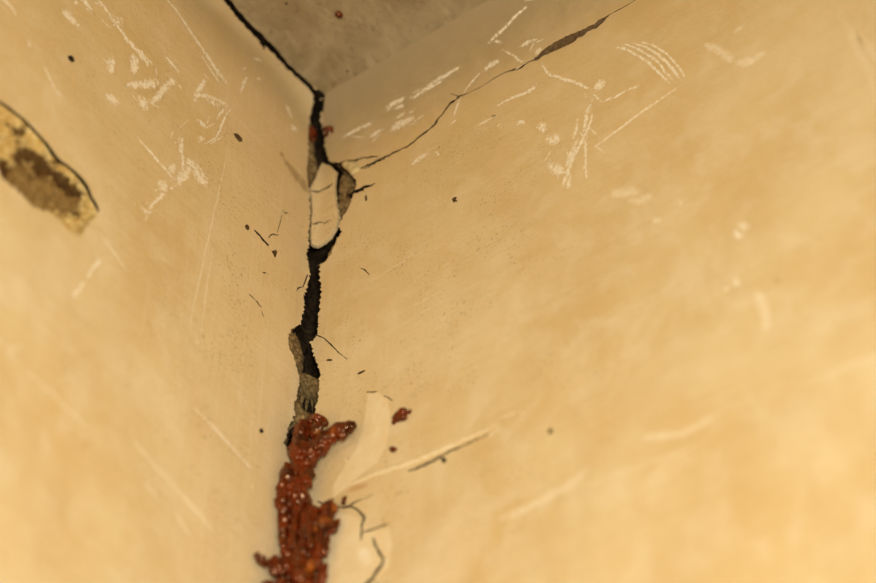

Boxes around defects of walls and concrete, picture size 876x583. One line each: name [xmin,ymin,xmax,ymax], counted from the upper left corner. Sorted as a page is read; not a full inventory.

spalling [0,102,99,236]
crack [224,0,532,448]
crack [318,494,388,583]